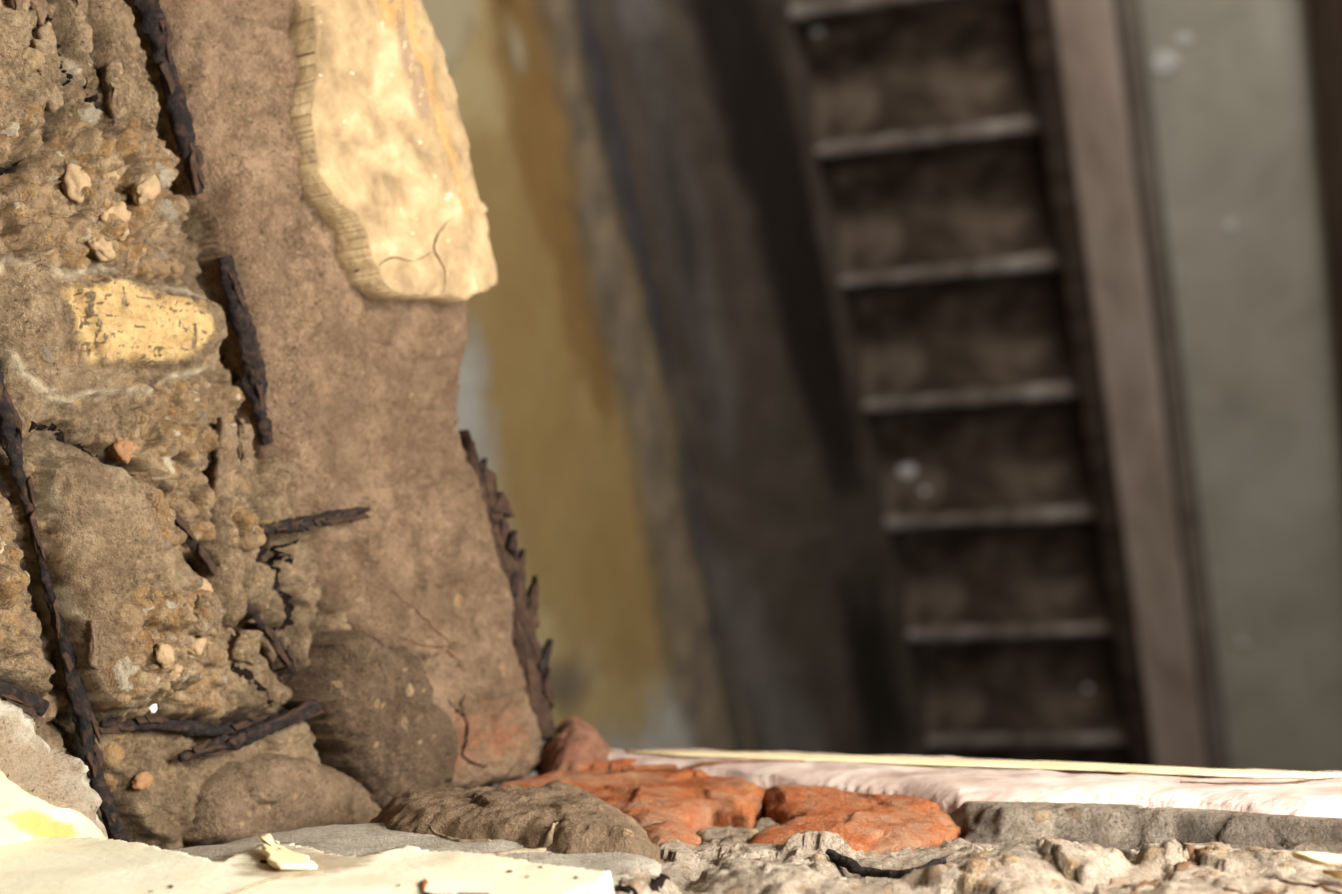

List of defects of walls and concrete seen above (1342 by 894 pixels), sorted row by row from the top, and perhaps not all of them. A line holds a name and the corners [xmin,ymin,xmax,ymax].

leakage [697,0,856,488]
spalling [0,0,351,758]
spalling [94,0,555,870]
rust [306,512,371,531]
leakage [468,0,824,753]
rust [0,694,38,717]
peeling [0,770,111,845]
rust [85,702,122,779]
leakage [849,606,903,747]
spalling [498,678,1342,894]